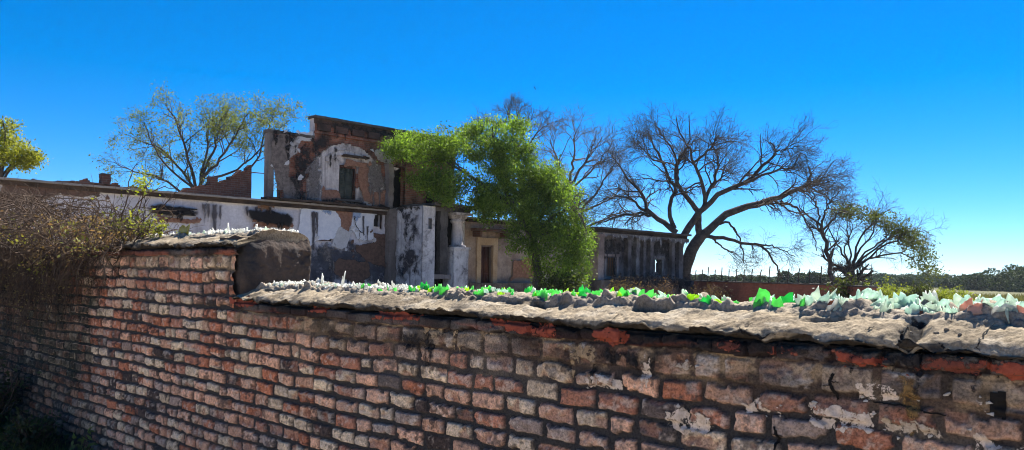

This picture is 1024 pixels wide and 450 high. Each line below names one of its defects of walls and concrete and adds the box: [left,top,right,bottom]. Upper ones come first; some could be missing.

water stain [196,193,228,230]
flaking render [316,186,386,284]
water stain [302,197,420,283]
peeling [665,403,711,435]
peeling [808,383,942,440]